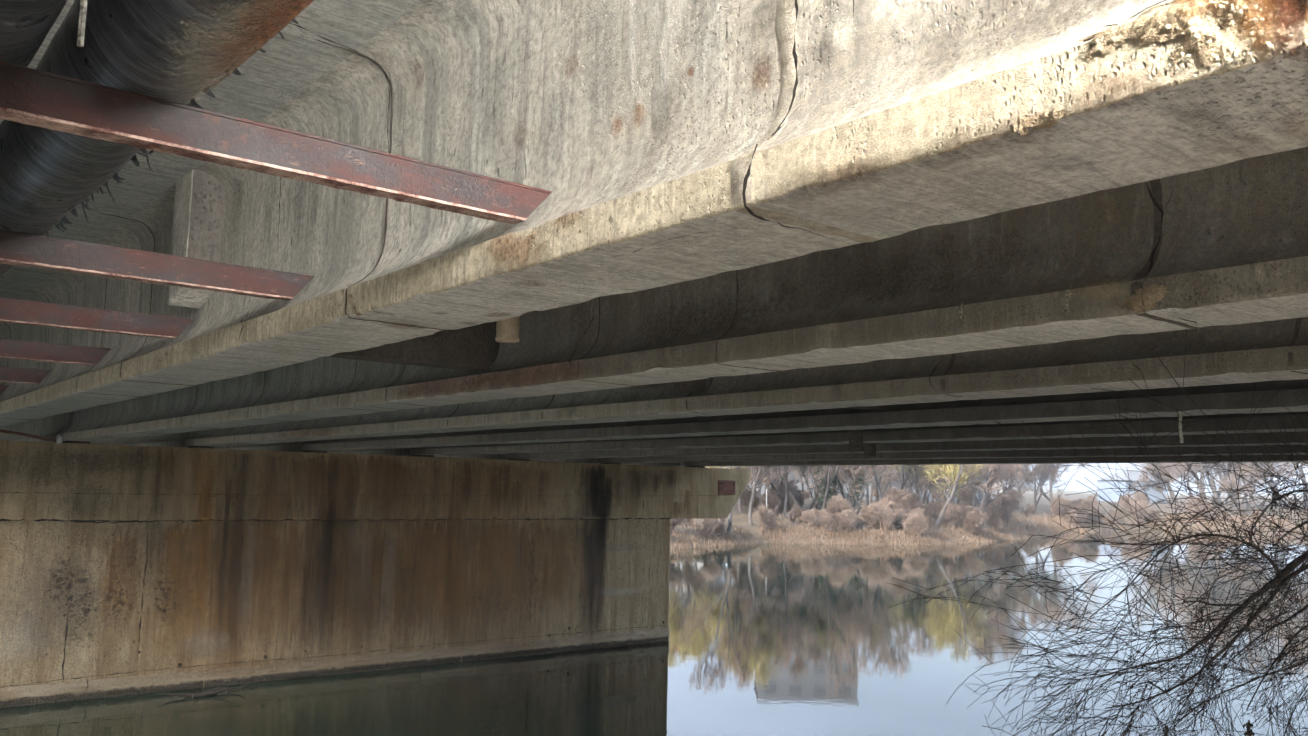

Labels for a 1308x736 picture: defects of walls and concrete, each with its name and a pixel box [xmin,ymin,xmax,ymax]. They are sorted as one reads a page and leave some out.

crack [736,0,828,238]
crack [1133,182,1214,327]